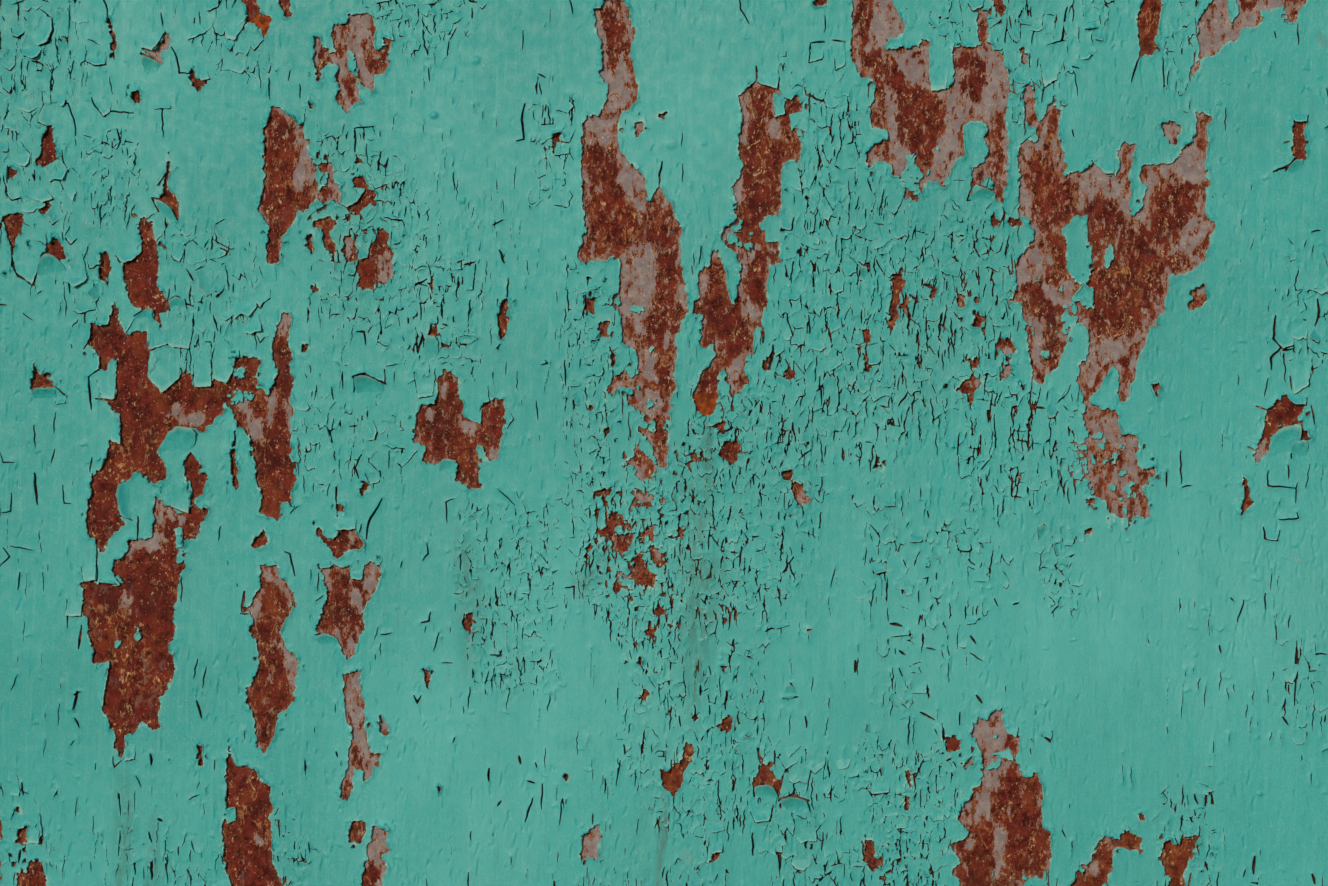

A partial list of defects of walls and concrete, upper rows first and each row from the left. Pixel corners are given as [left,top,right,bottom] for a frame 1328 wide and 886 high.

peeling [313,0,401,113]
peeling [258,96,442,293]
crack [328,220,509,538]
peeling [413,318,514,489]
peeling [457,0,1215,714]
crack [957,354,1064,470]
crack [1263,465,1310,541]
crack [1256,299,1320,407]
peeling [311,504,389,801]
crack [1219,593,1327,725]
crack [679,640,864,886]
peeling [749,667,1052,886]